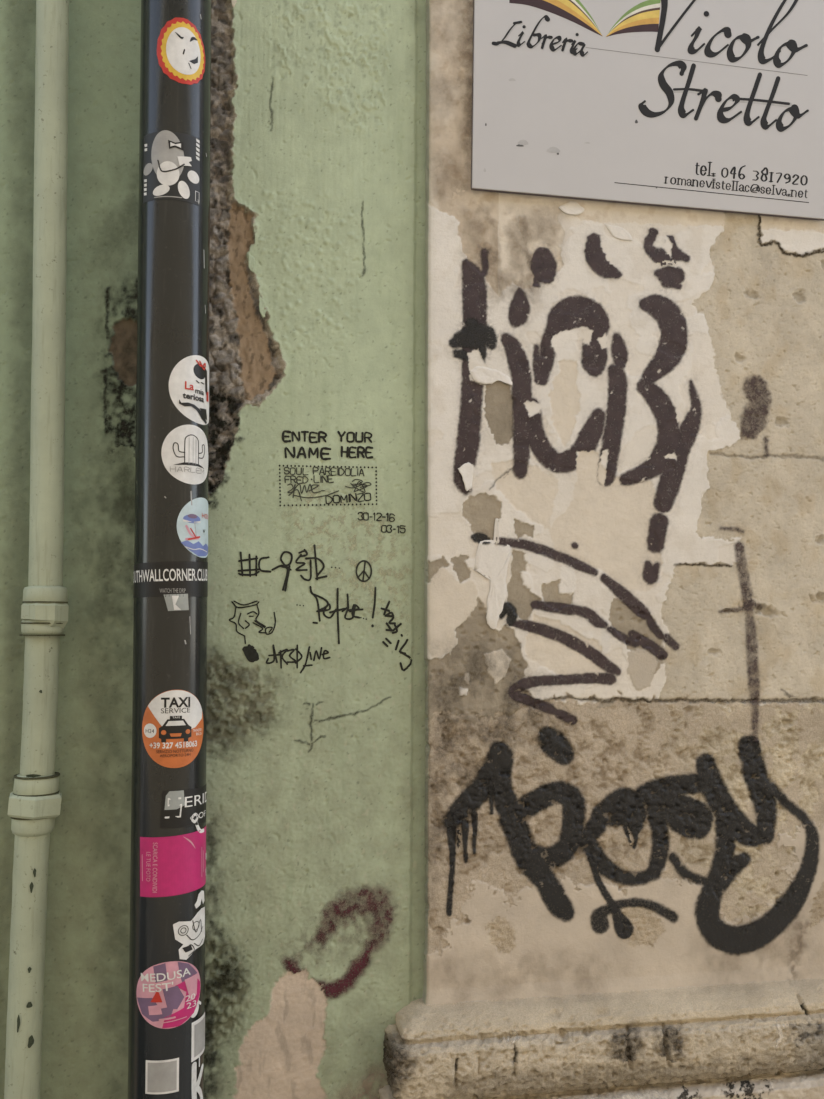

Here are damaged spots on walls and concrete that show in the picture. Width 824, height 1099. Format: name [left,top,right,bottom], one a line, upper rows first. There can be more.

spalling [208,0,287,501]
flaking render [424,0,824,960]
peeling [17,1002,34,1048]
peeling [204,921,328,1099]